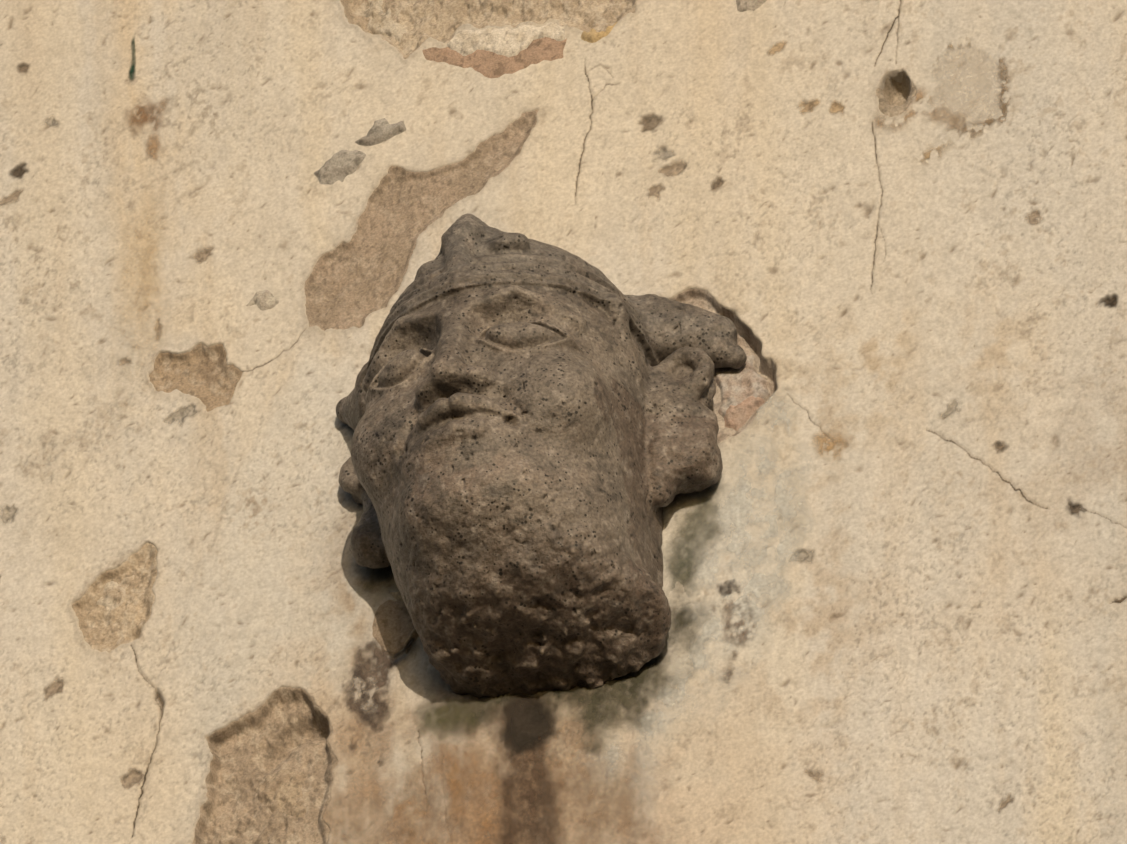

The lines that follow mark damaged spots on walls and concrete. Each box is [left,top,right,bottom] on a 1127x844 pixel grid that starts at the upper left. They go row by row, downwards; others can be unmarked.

spalling [340,0,637,78]
crack [875,0,901,64]
spalling [876,72,916,117]
peeling [304,109,538,331]
spalling [149,343,243,424]
spalling [72,543,158,653]
crack [132,754,153,837]
spalling [192,687,338,844]
leakage [381,693,595,844]